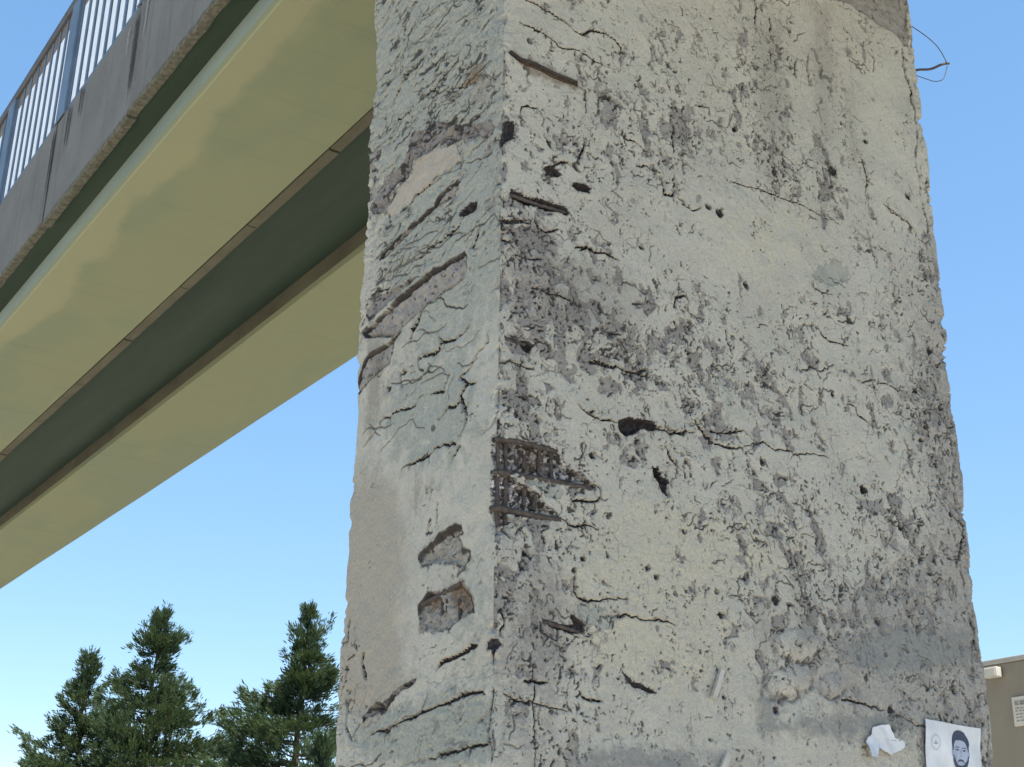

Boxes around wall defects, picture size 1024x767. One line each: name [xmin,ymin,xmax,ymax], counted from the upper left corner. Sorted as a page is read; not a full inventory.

leakage [126,0,149,94]
crack [519,0,622,63]
spalling [370,119,515,260]
crack [520,84,700,212]
crack [371,219,617,302]
crack [384,313,533,465]
spalling [489,434,597,528]
crack [589,360,647,377]
spalling [618,417,656,437]
crack [653,420,828,466]
spalling [415,523,474,635]
crack [345,620,601,766]